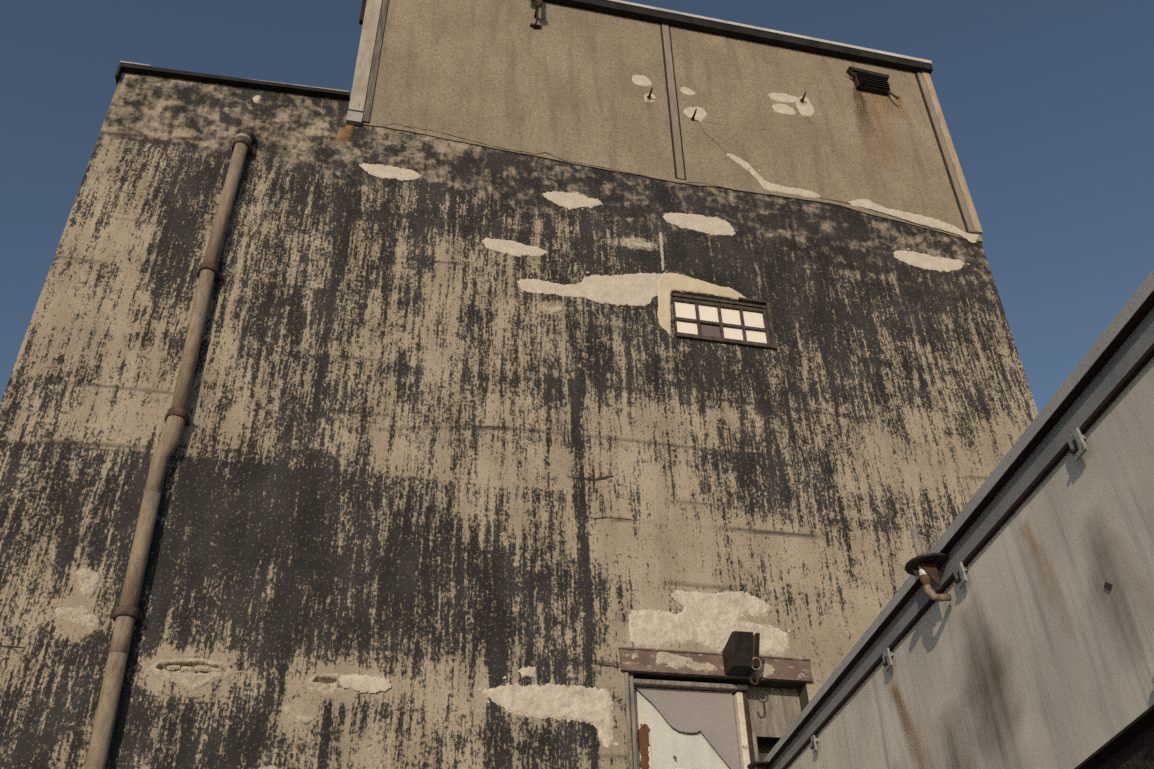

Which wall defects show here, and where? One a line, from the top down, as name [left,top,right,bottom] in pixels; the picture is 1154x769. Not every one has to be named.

spalling [542,305,564,315]
spalling [146,658,241,691]
spalling [305,673,392,696]
corrosion [637,724,650,769]